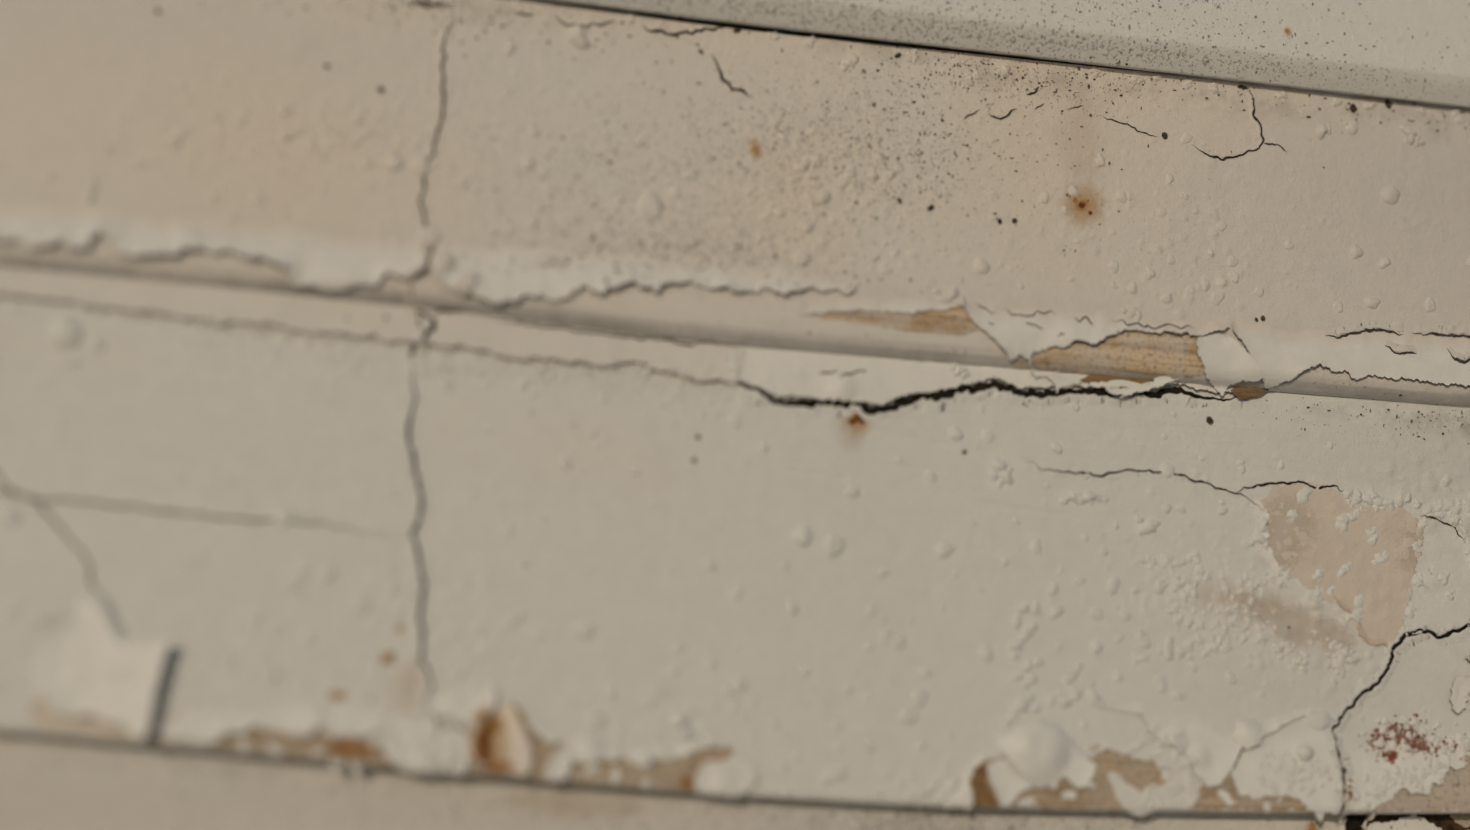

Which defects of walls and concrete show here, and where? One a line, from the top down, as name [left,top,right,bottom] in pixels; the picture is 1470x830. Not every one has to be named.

rust [1072,195,1094,216]
crack [1192,85,1287,161]
crack [0,0,1265,737]
peeling [0,202,1470,399]
rust [848,412,865,430]
spalling [1236,480,1470,652]
peeling [20,595,758,798]
rust [475,712,514,772]
crack [1324,618,1470,813]